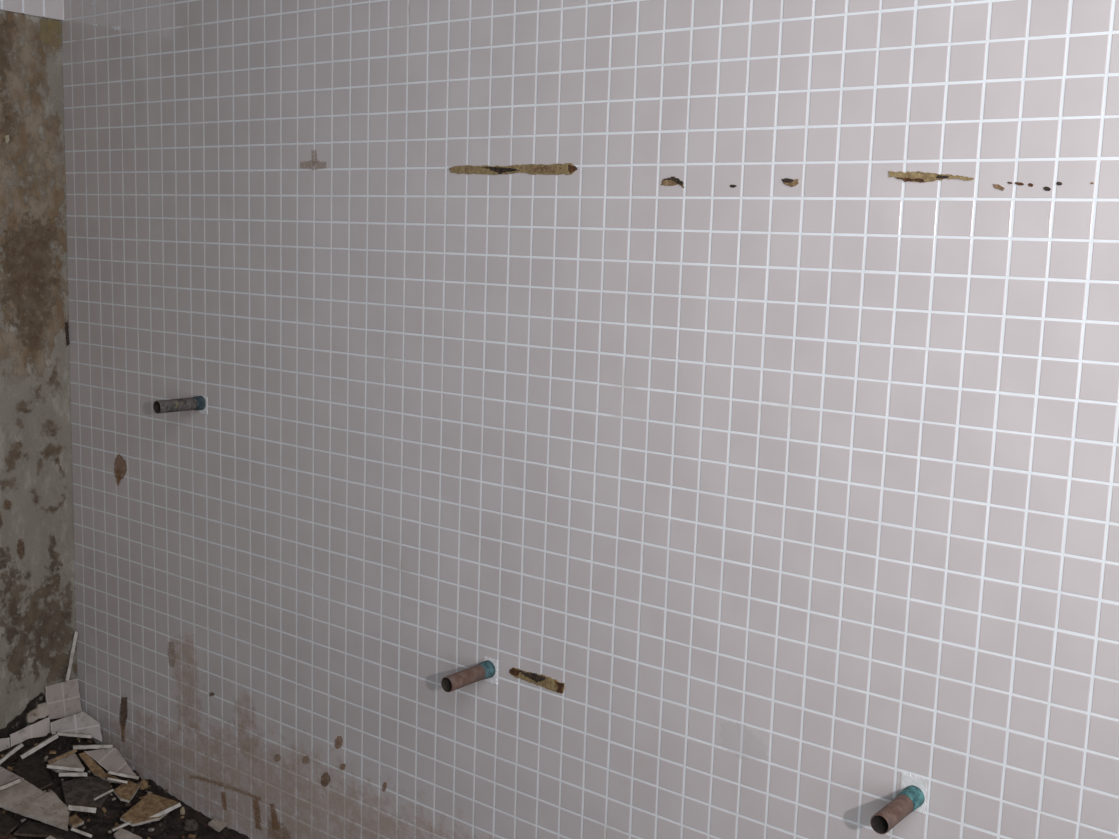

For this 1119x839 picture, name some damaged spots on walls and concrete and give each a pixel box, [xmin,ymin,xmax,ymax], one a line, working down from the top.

leakage [0,11,78,739]
rust [114,454,127,485]